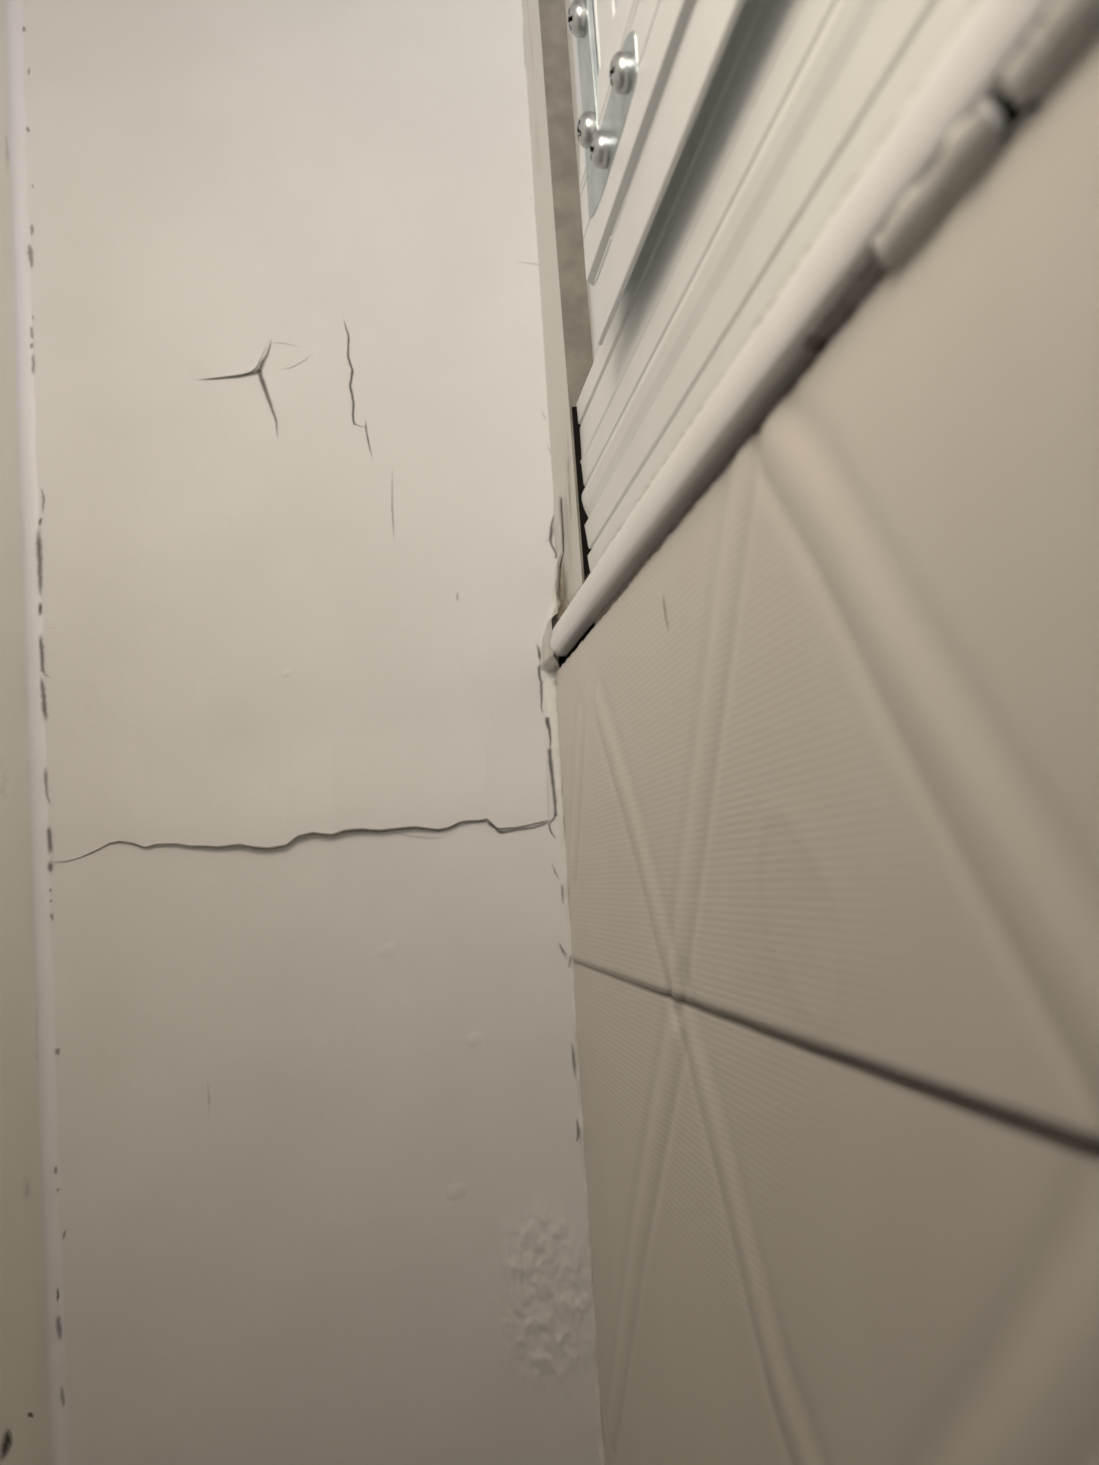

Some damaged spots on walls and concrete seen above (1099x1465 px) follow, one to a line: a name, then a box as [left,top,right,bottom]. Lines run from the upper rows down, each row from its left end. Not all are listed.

crack [345,325,370,448]
crack [37,497,46,716]
crack [549,497,563,616]
crack [45,648,556,917]